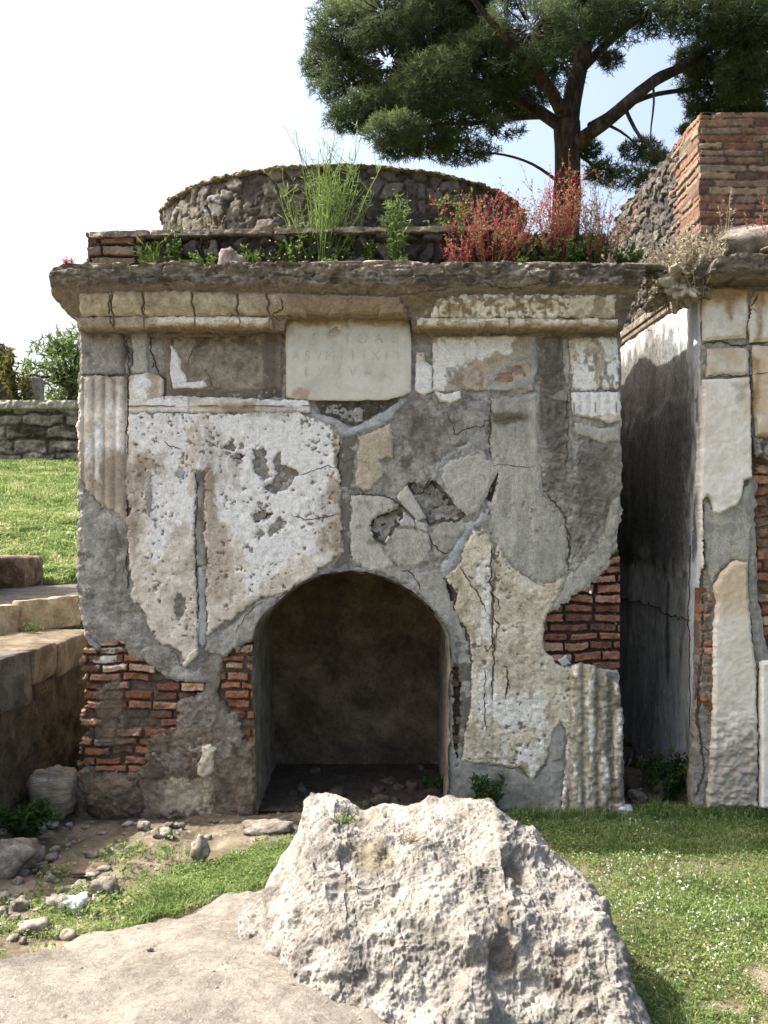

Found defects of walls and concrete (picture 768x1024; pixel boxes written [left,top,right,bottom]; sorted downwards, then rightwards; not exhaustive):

flaking render [79,630,206,772]
flaking render [219,640,255,743]
flaking render [224,443,299,494]
crack [291,440,510,729]
crack [447,399,533,468]
crack [543,491,571,571]
crack [563,390,571,468]
flaking render [543,549,620,671]
leakage [617,327,697,569]
crack [620,501,710,794]
flaking render [694,587,713,715]
flaking render [751,437,768,646]